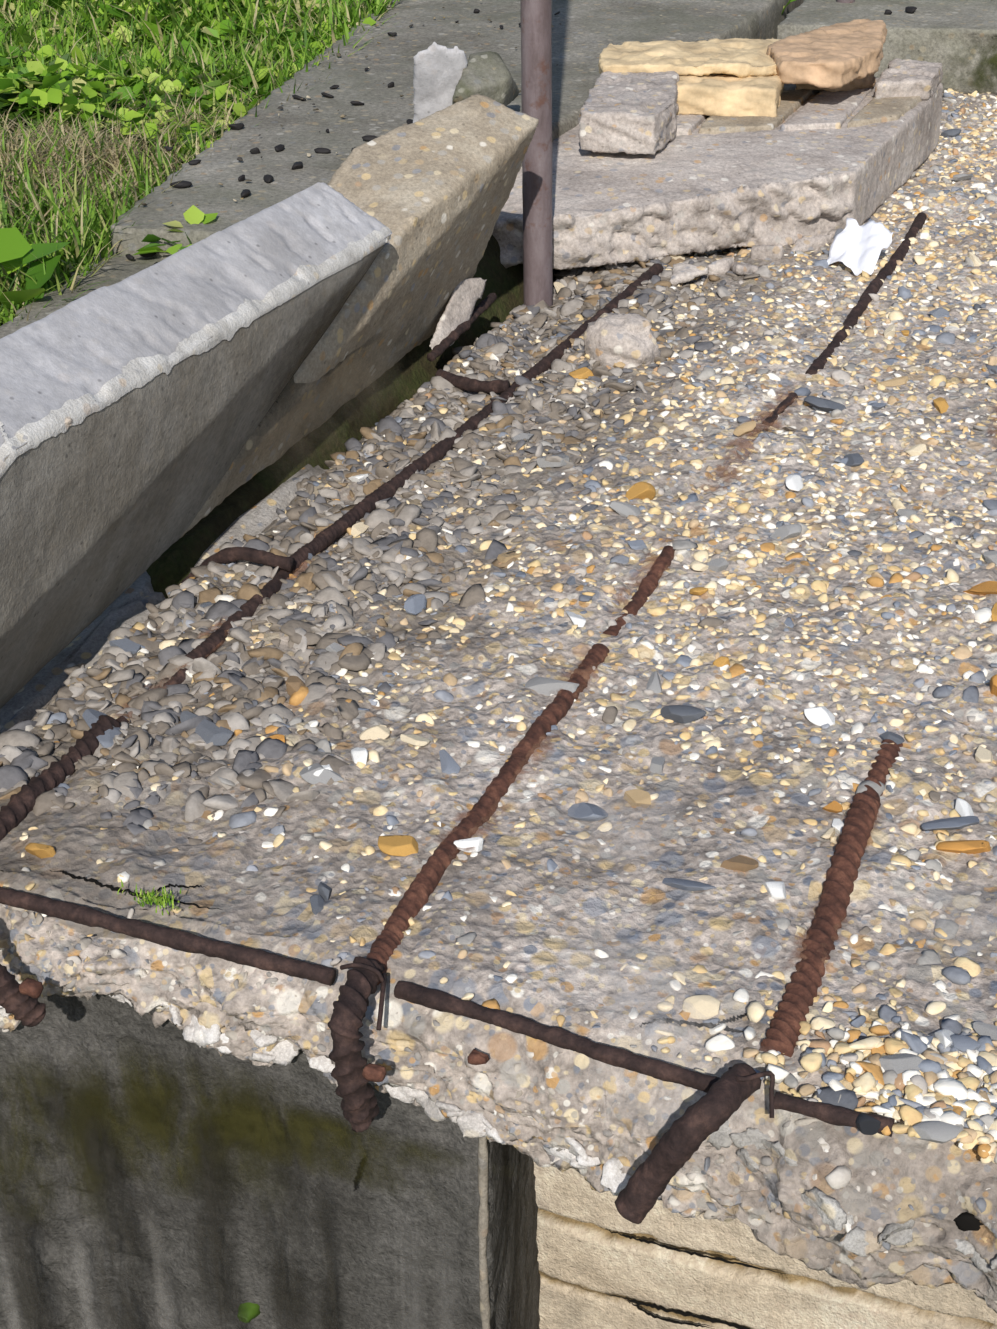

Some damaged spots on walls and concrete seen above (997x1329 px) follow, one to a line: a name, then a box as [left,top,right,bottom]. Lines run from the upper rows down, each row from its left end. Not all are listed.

spalling [108,994,132,1007]
spalling [160,1002,232,1054]
spalling [248,1030,335,1073]
corrosion [467,1049,489,1065]
spalling [384,1085,503,1143]
spalling [543,1137,631,1196]
spalling [707,1120,798,1172]
spalling [801,1187,915,1257]
crack [601,1227,787,1274]
spalling [954,1239,997,1273]
crack [606,1293,750,1329]